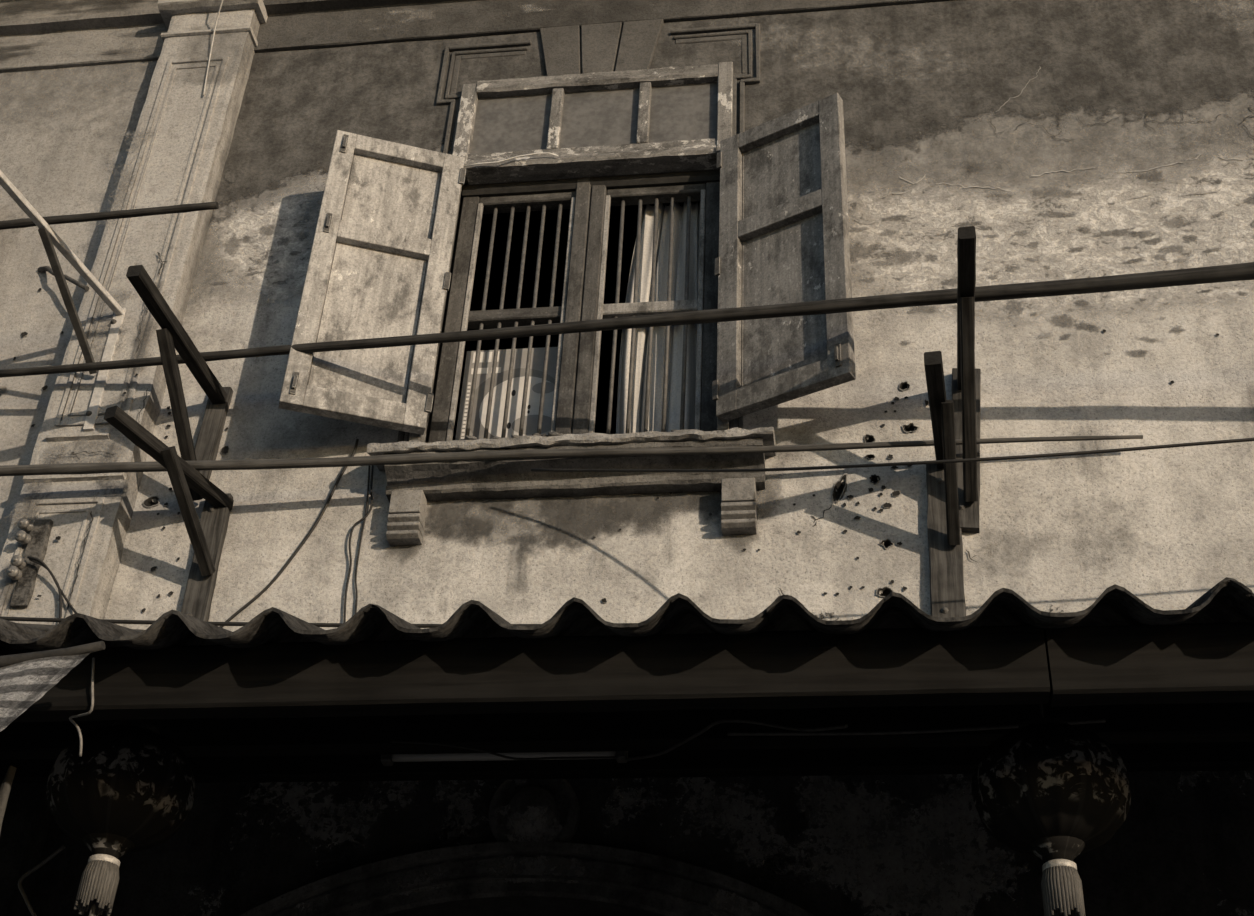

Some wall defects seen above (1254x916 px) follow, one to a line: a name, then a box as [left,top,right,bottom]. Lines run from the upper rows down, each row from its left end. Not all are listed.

crack [990,106,1254,140]
peeling [213,176,326,302]
peeling [847,135,1254,314]
peeling [975,280,1254,356]
damp [425,491,722,551]